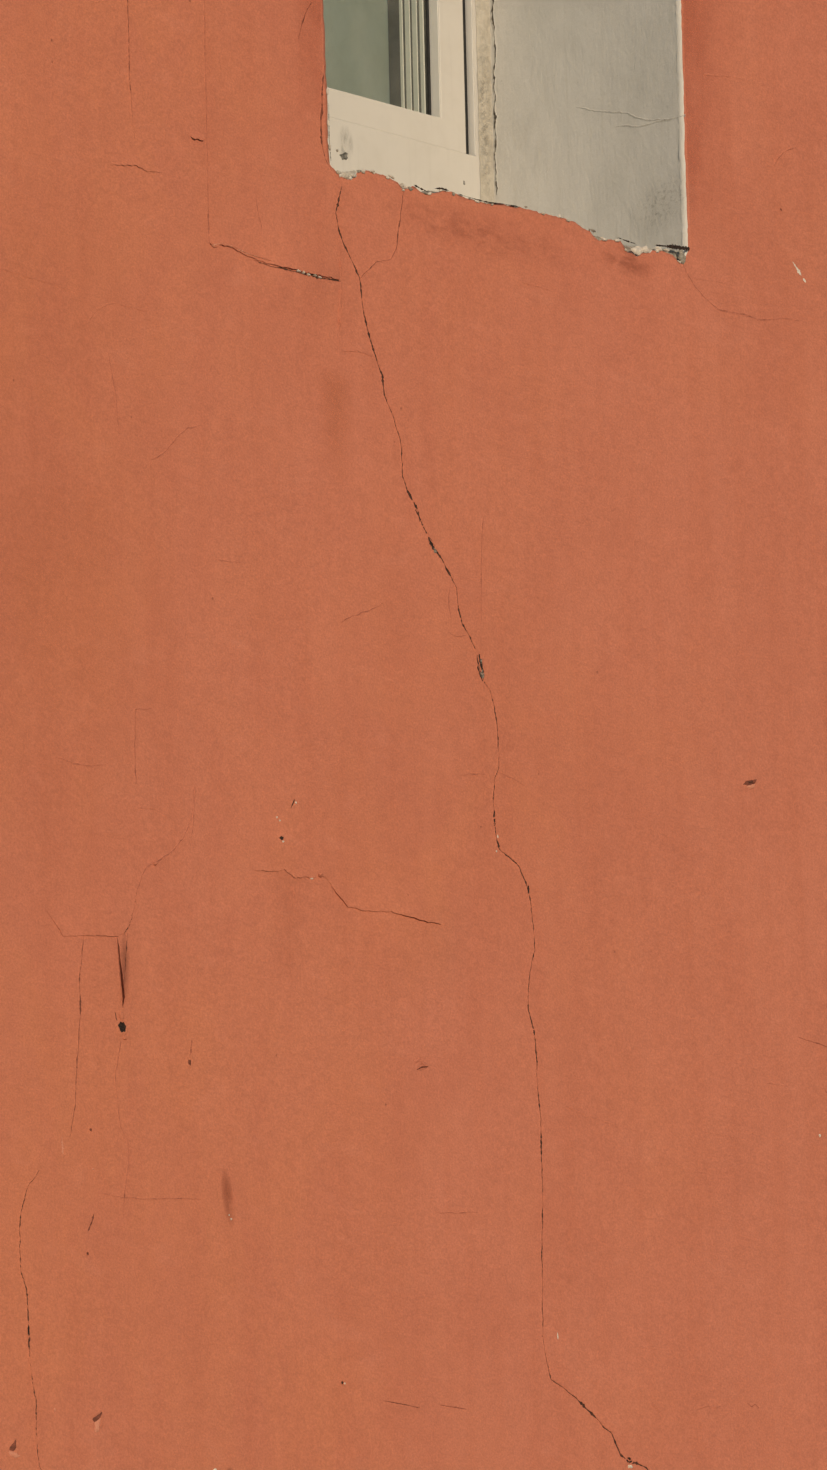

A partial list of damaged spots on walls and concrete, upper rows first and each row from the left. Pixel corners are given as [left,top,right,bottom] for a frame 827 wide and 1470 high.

spalling [326,89,571,222]
spalling [588,229,690,264]
crack [319,66,650,1470]
crack [69,785,195,1136]
crack [18,1170,42,1470]